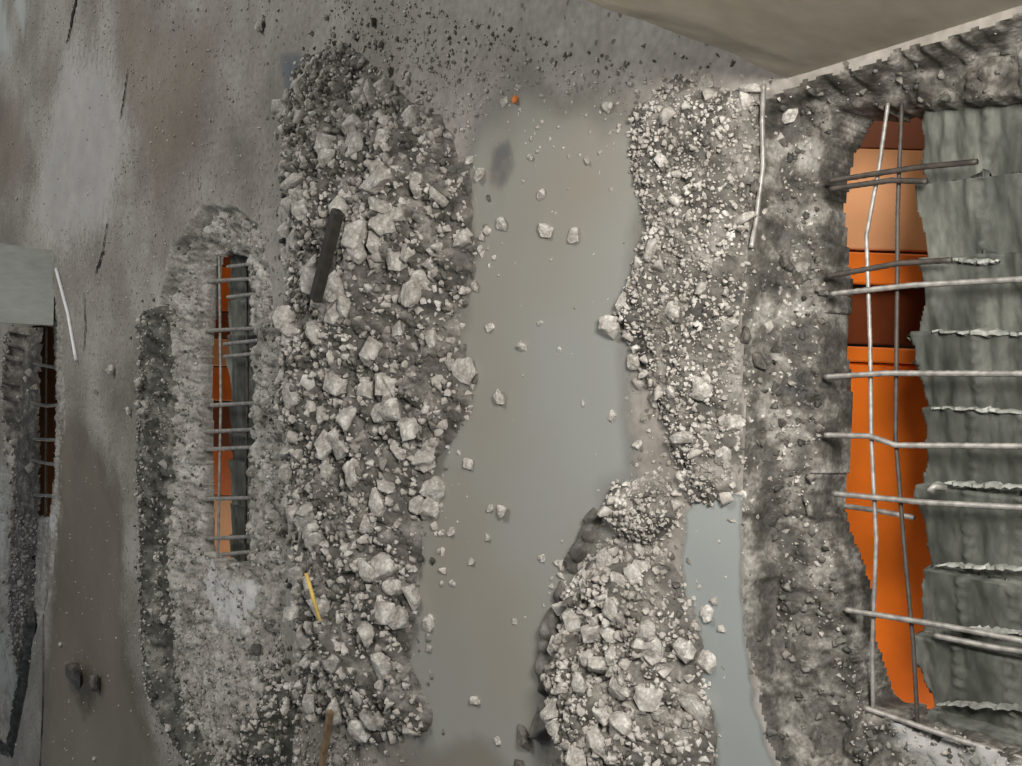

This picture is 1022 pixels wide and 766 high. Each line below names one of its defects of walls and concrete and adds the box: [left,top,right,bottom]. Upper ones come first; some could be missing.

crack [66,0,76,43]
spalling [0,437,25,757]
spalling [30,290,65,644]
spalling [157,203,289,765]
spalling [740,12,1022,766]